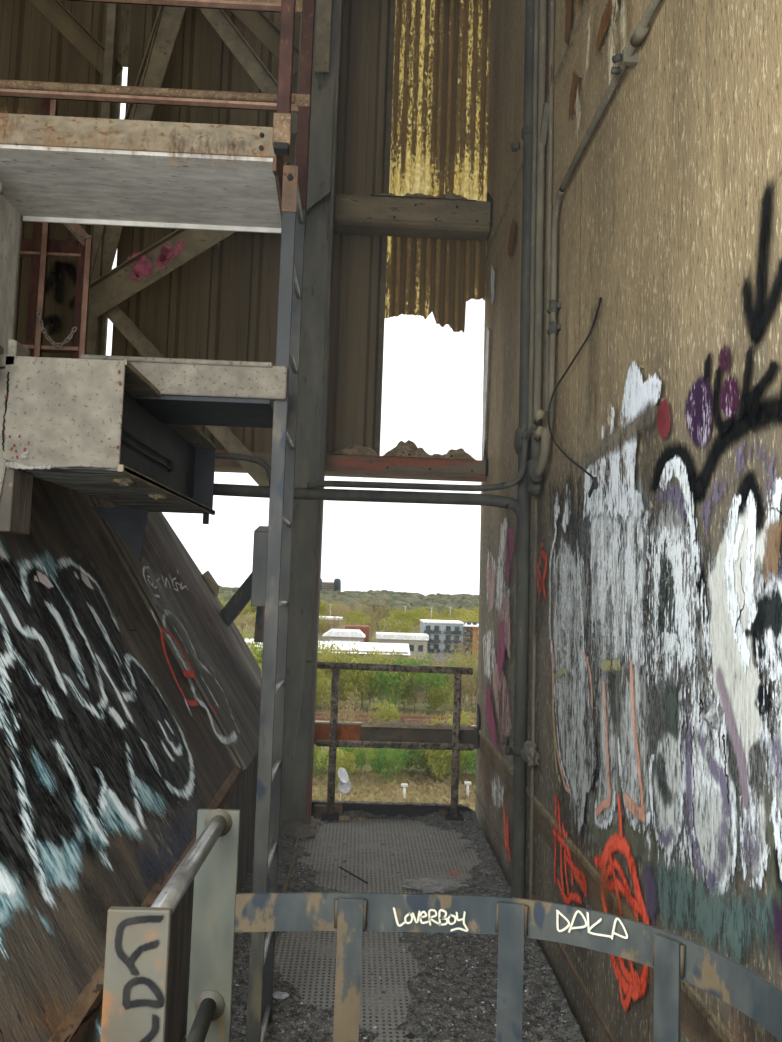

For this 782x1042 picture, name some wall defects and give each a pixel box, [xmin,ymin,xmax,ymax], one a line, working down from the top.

peeling [595,0,618,55]
peeling [569,73,582,119]
crack [1,372,9,451]